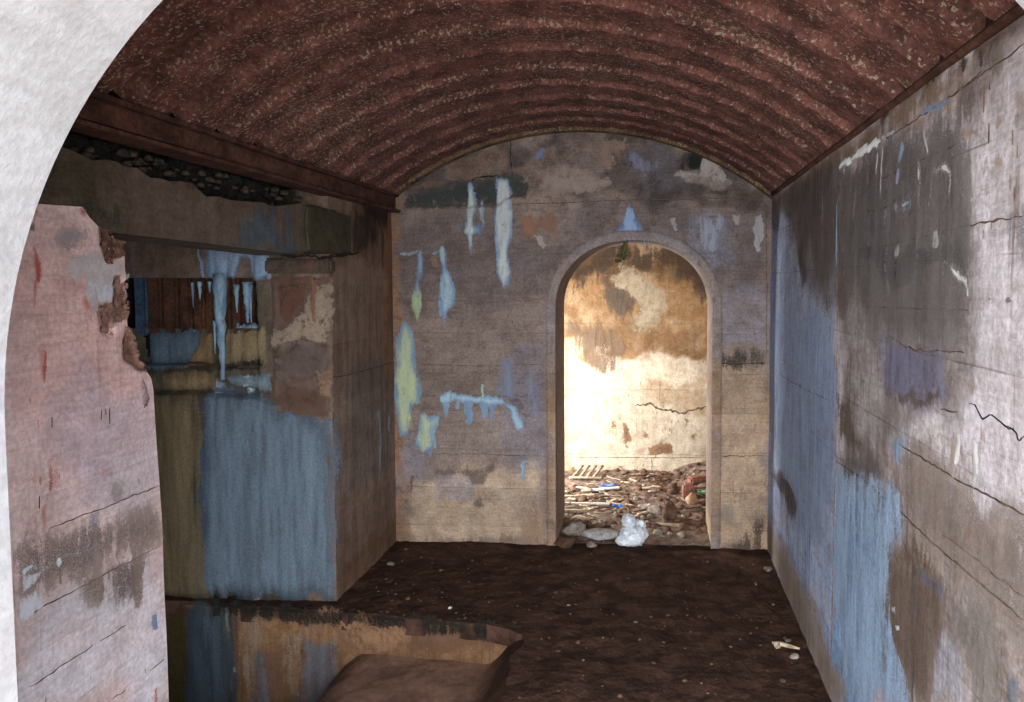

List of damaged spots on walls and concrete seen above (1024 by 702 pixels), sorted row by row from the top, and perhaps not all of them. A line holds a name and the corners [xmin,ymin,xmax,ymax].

spalling [62,132,303,206]
water stain [694,214,740,253]
peeling [53,223,150,408]
flaking render [269,275,336,418]
water stain [565,244,707,376]
crack [423,141,1024,694]
water stain [709,36,1024,702]
water stain [12,482,164,625]